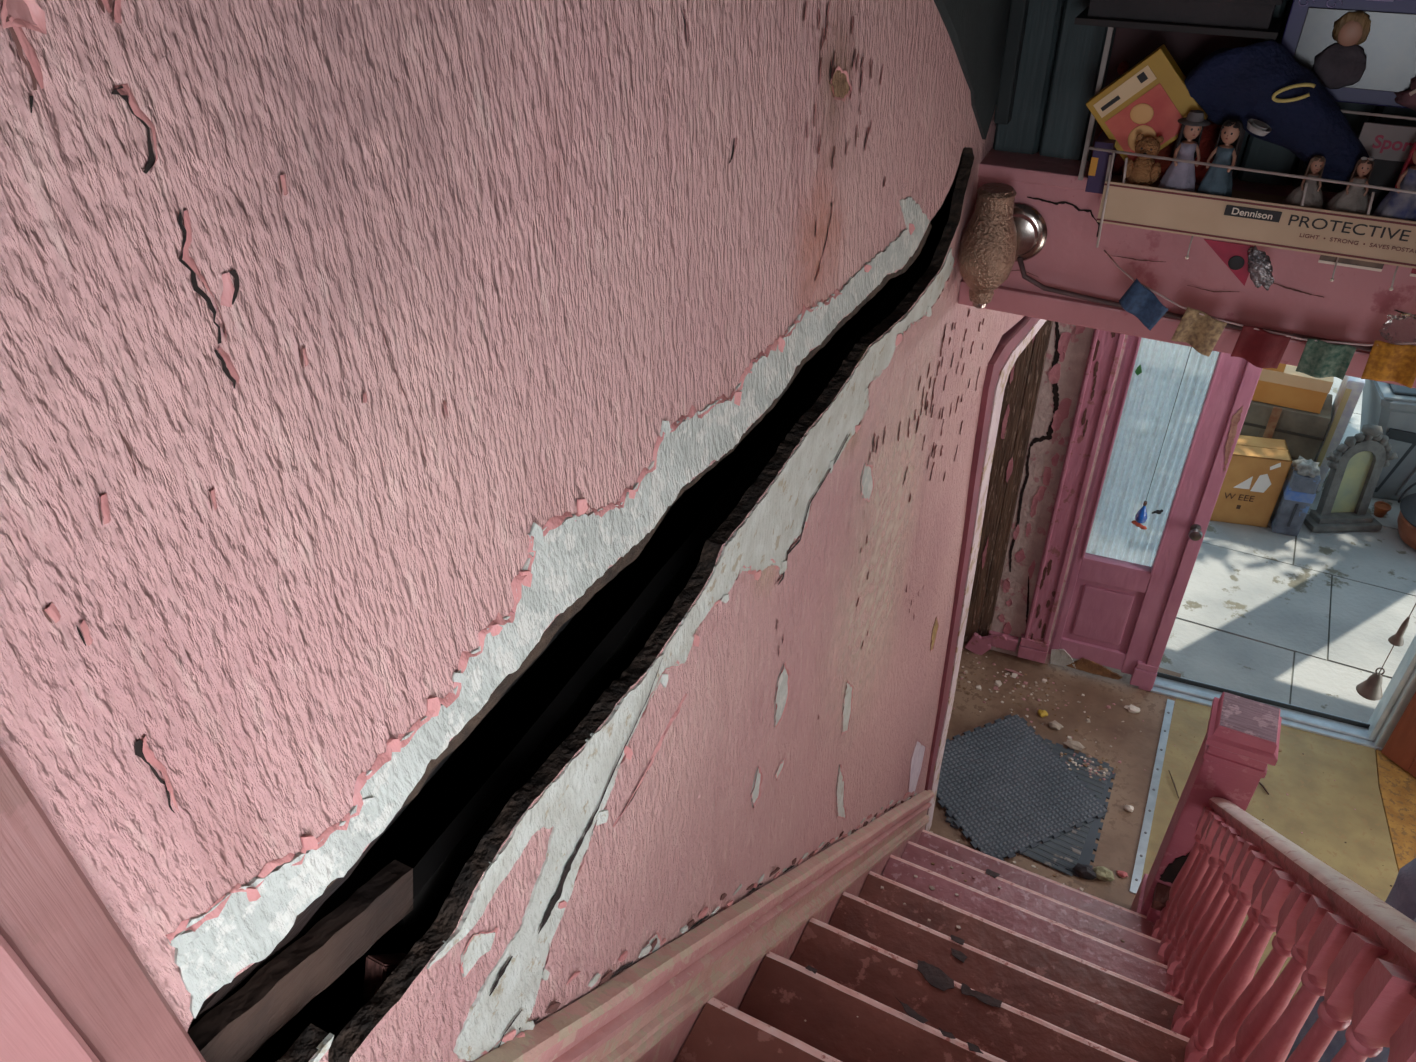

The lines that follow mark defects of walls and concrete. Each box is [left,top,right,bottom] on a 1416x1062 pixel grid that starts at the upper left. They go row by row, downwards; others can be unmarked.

peeling [1,0,47,35]
spalling [97,0,122,24]
spalling [803,1,884,169]
spalling [300,347,309,368]
spalling [860,309,984,502]
spalling [98,493,111,526]
crack [1009,322,1060,624]
spalling [76,620,93,646]
crack [165,147,974,1062]
peeling [774,619,790,728]
spalling [566,740,926,987]
spalling [502,1001,561,1042]